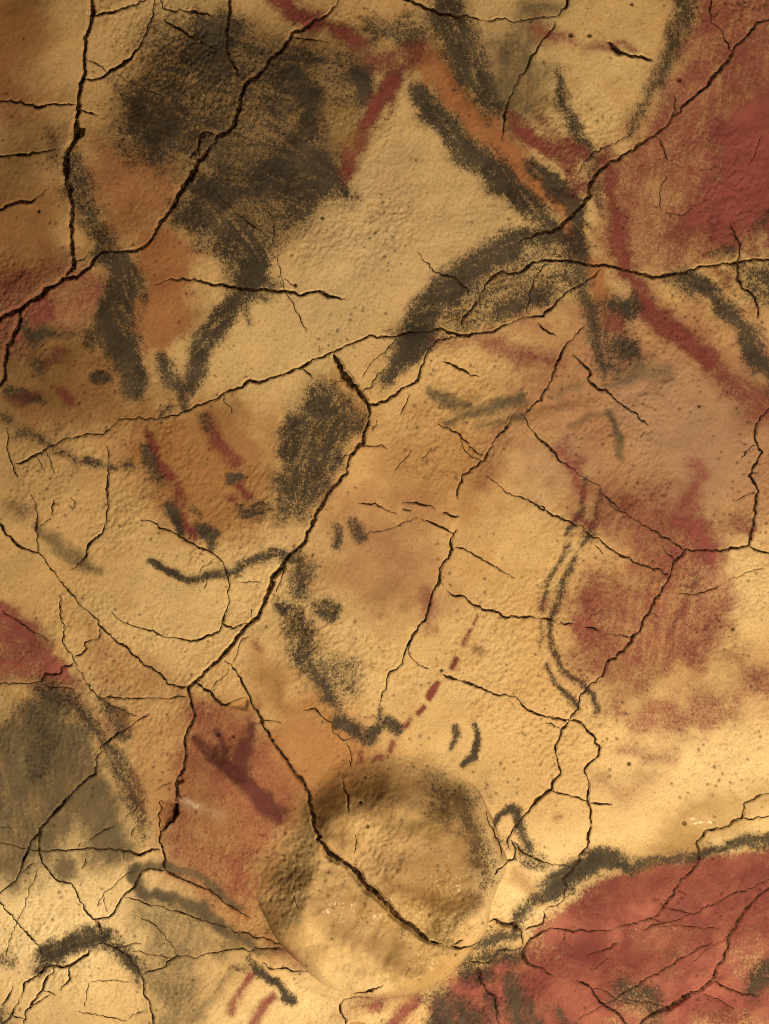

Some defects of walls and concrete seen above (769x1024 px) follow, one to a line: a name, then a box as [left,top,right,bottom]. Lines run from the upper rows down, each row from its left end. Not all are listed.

crack [0,0,345,386]
crack [405,0,569,141]
crack [517,0,769,244]
crack [0,222,769,1024]